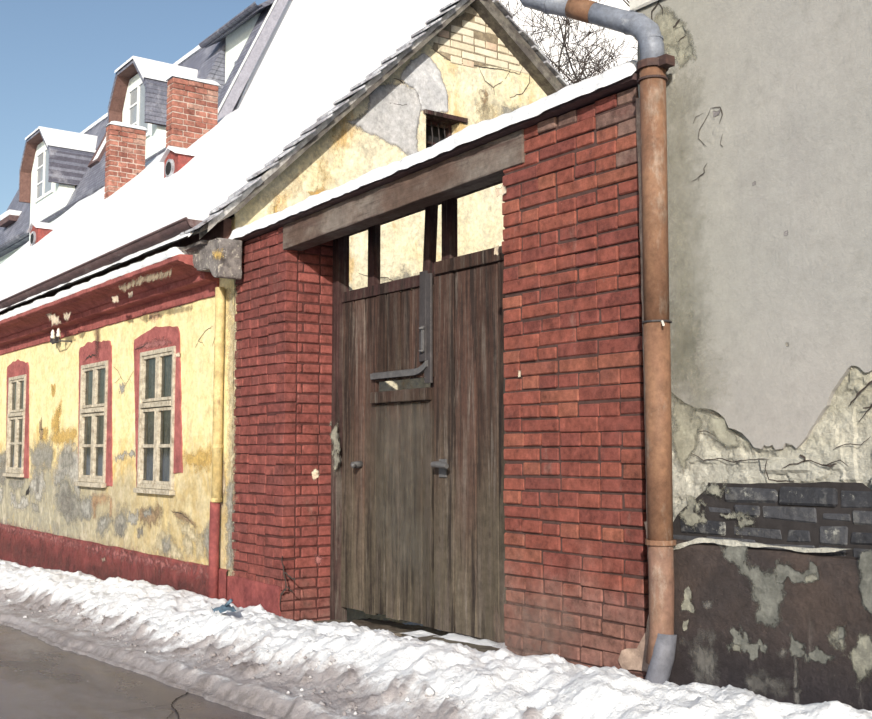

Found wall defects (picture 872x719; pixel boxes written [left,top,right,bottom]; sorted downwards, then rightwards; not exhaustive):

flaking render [430,6,529,75]
peeling [654,7,697,66]
crack [479,64,530,98]
peeling [112,270,172,303]
peeling [0,384,81,512]
peeling [330,422,341,470]
spalling [671,366,872,631]
peeling [0,505,208,579]
leakage [693,635,716,684]
peeling [727,627,768,661]
leakage [747,655,801,704]
peeling [780,625,872,681]